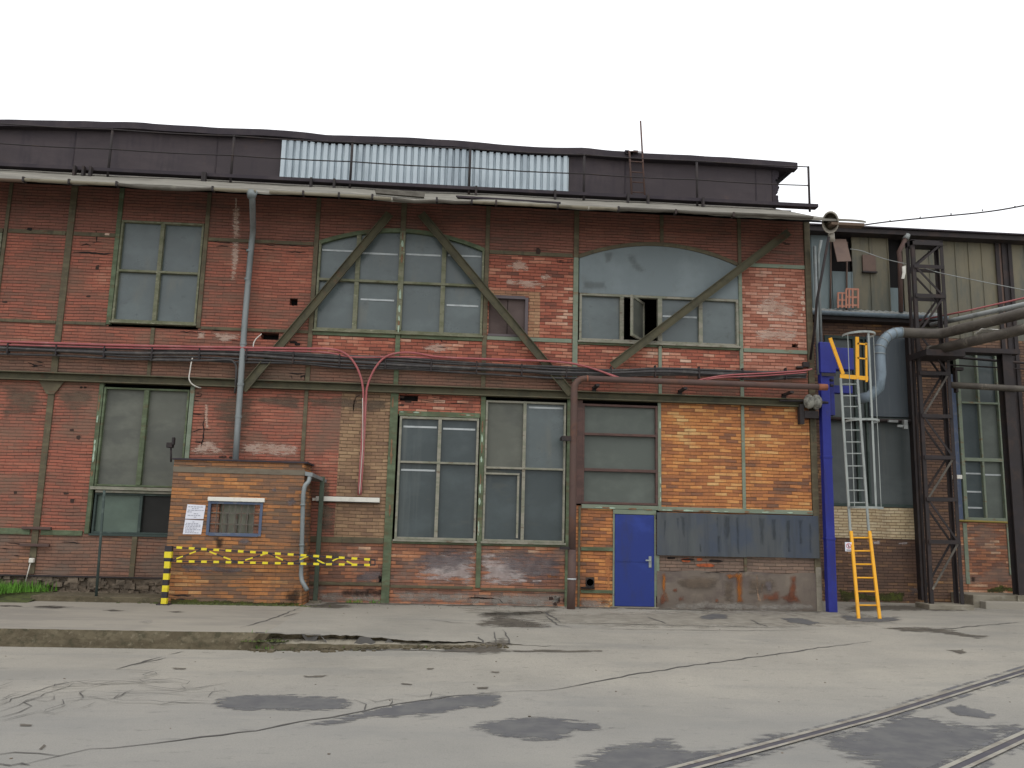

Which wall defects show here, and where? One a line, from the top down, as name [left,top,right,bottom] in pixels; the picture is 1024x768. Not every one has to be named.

water stain [232,198,240,280]
water stain [400,552,602,653]
rust [764,577,798,602]
crack [0,626,869,765]